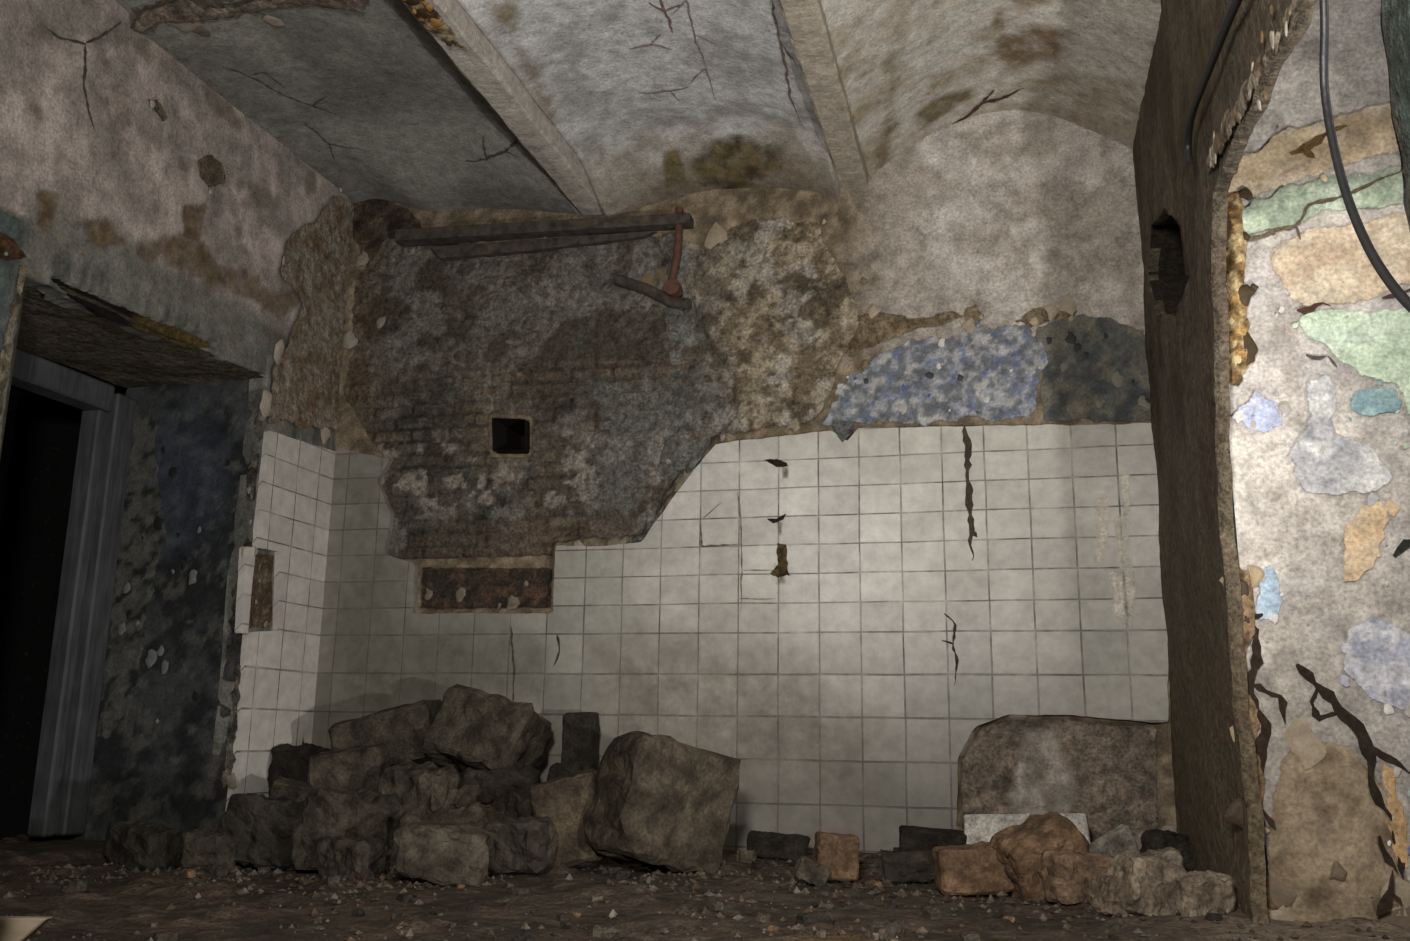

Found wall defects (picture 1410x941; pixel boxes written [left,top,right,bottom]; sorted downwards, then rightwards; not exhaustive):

crack [44,0,253,130]
flaking render [130,0,370,36]
crack [223,67,362,162]
flaking render [400,0,467,50]
flaking render [1206,0,1298,172]
spalling [1148,215,1189,316]
flaking render [0,265,28,423]
flaking render [1226,103,1410,582]
flaking render [222,188,1151,789]
crack [962,426,977,561]
peeling [100,413,201,739]